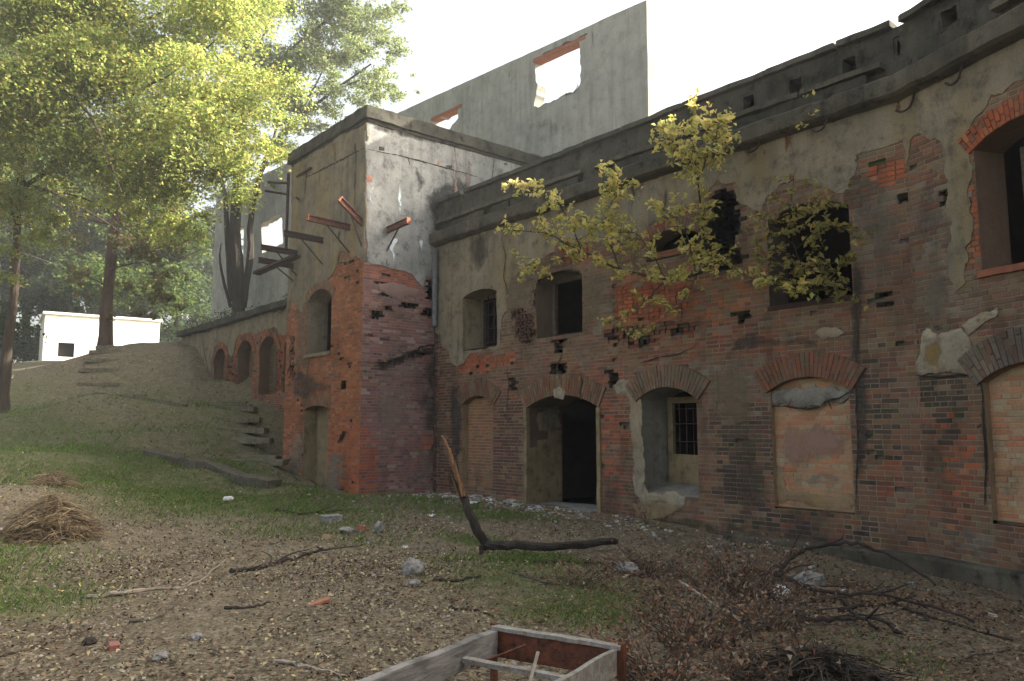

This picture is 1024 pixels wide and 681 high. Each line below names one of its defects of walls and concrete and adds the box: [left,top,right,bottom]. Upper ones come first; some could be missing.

crack [307,148,494,182]
leakage [416,172,467,231]
spalling [861,158,908,204]
spalling [965,190,982,271]
spalling [335,251,432,320]
spalling [602,281,700,349]
spalling [730,310,752,325]
spalling [375,346,434,371]
spalling [451,308,537,391]